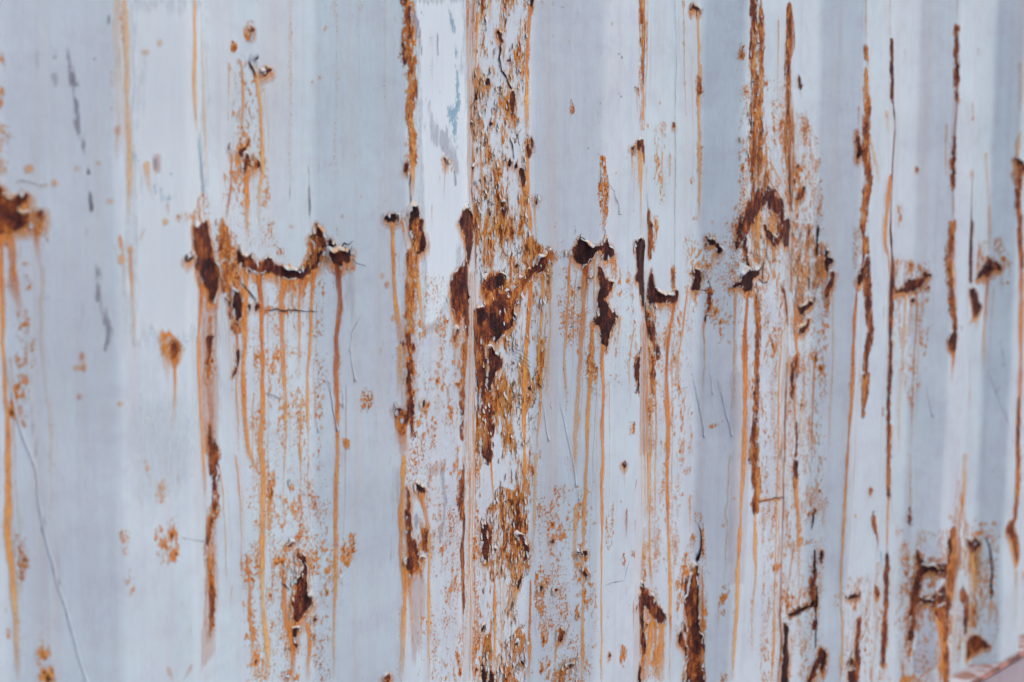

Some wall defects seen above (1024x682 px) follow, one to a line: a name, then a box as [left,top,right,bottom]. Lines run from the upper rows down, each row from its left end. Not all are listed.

corrosion [0,124,48,653]
corrosion [158,329,183,394]
corrosion [164,193,225,644]
corrosion [232,101,270,209]
corrosion [235,220,365,682]
peeling [470,0,553,682]
corrosion [383,0,1024,682]